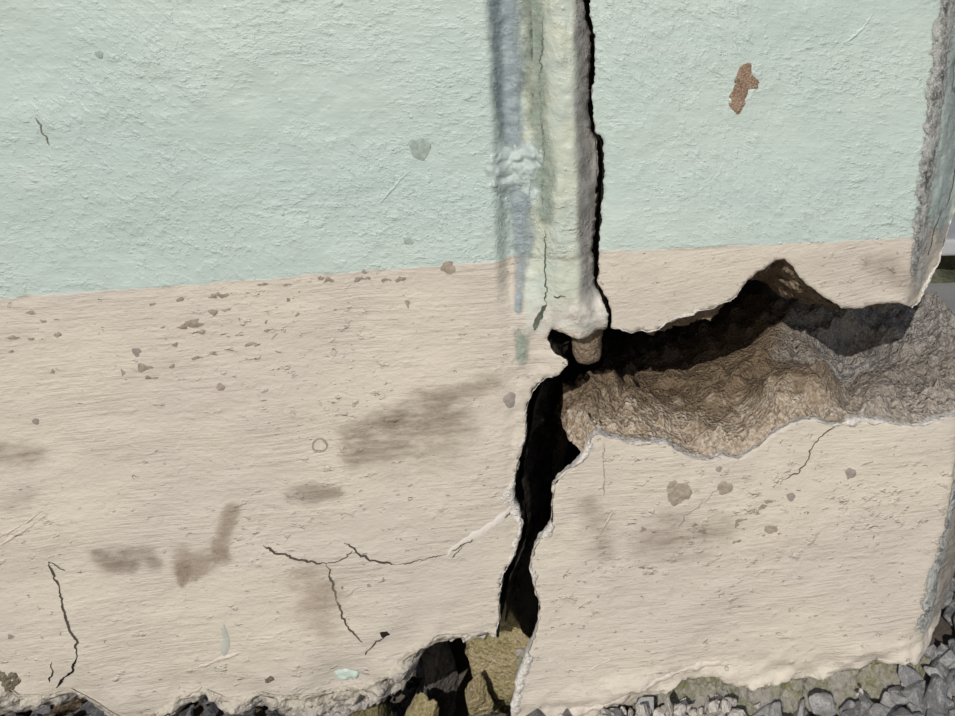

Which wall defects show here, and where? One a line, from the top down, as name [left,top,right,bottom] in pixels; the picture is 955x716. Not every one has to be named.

water stain [488,0,524,145]
peeling [728,63,759,115]
water stain [509,132,555,312]
crack [533,233,566,330]
crack [584,0,612,320]
spalling [610,289,741,335]
spalling [750,259,840,311]
spalling [0,671,118,716]
crack [48,562,79,688]
spalling [142,576,510,716]
crack [264,540,473,655]
crack [496,375,613,716]